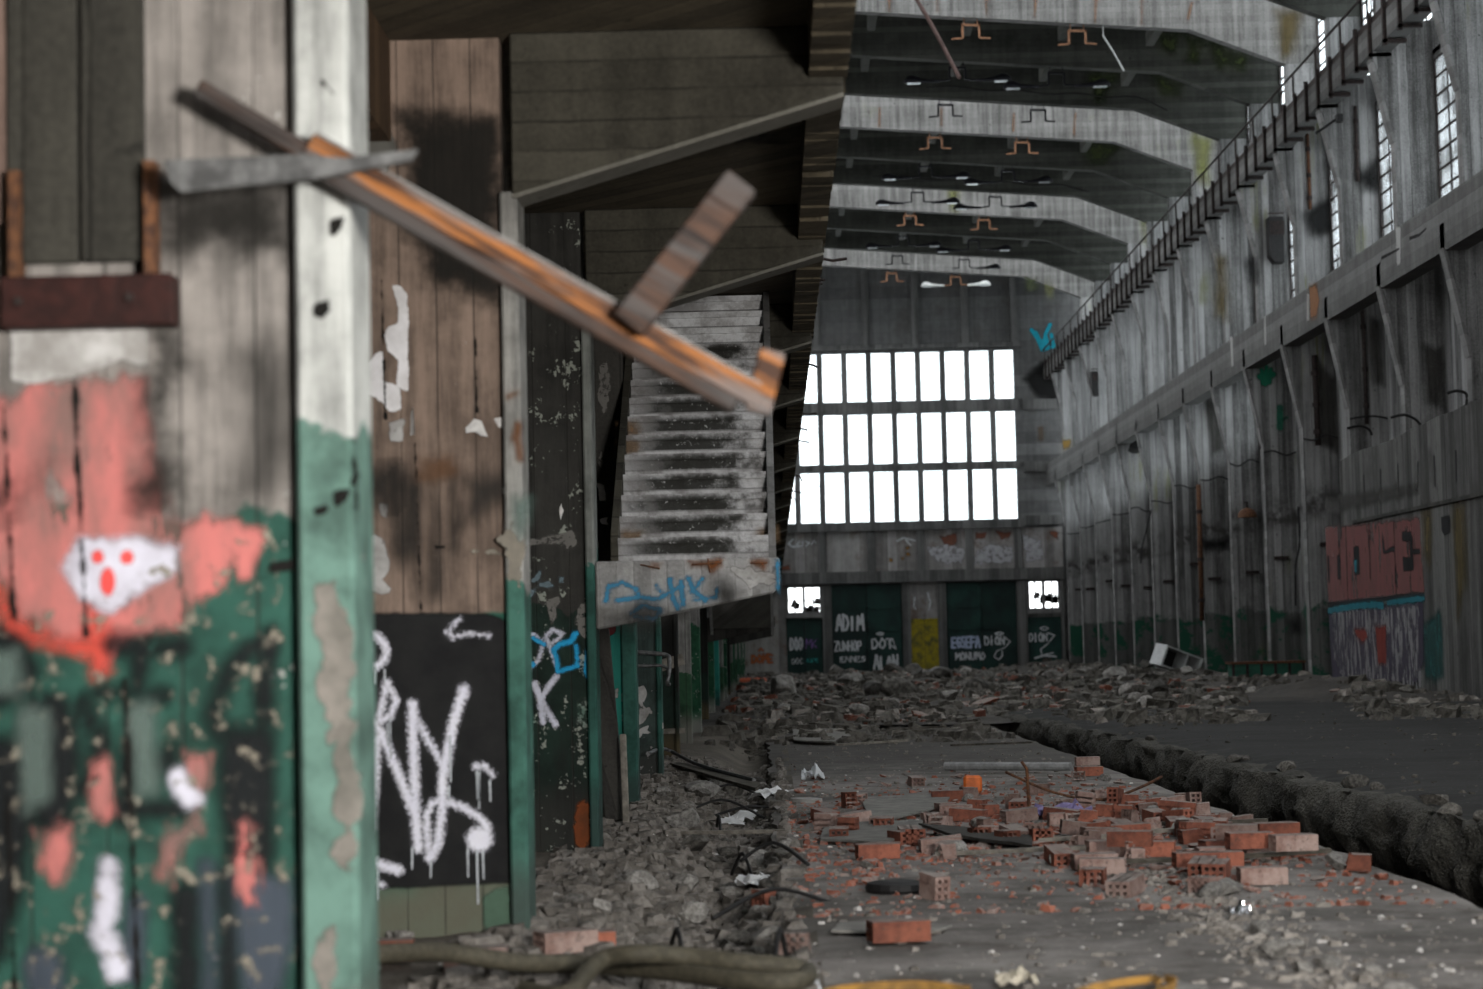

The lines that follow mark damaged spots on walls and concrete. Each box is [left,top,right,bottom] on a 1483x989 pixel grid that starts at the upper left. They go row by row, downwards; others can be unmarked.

peeling [371,285,415,442]
peeling [149,565,172,577]
spalling [237,529,295,614]
peeling [373,534,391,594]
peeling [91,664,260,748]
peeling [238,747,259,765]
peeling [313,579,364,873]
peeling [122,782,141,838]
peeling [175,827,283,884]
peeling [3,891,101,989]
peeling [148,954,166,989]
peeling [312,925,338,989]